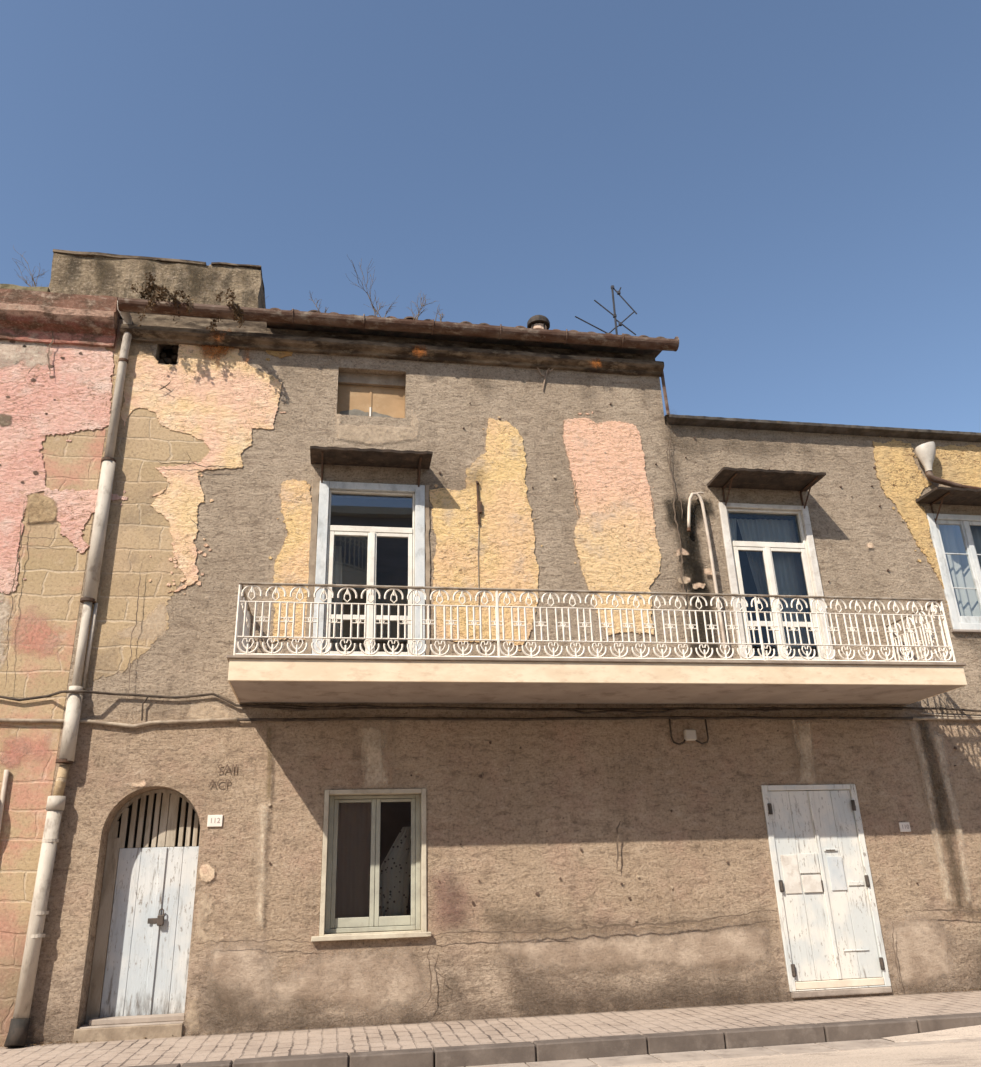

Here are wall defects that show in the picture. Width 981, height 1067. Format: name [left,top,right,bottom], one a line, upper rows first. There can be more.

flaking render [0,337,293,689]
peeling [266,479,317,643]
peeling [429,416,543,651]
peeling [562,412,662,635]
leakage [665,498,719,655]
peeling [871,436,981,611]
crack [412,910,775,1013]